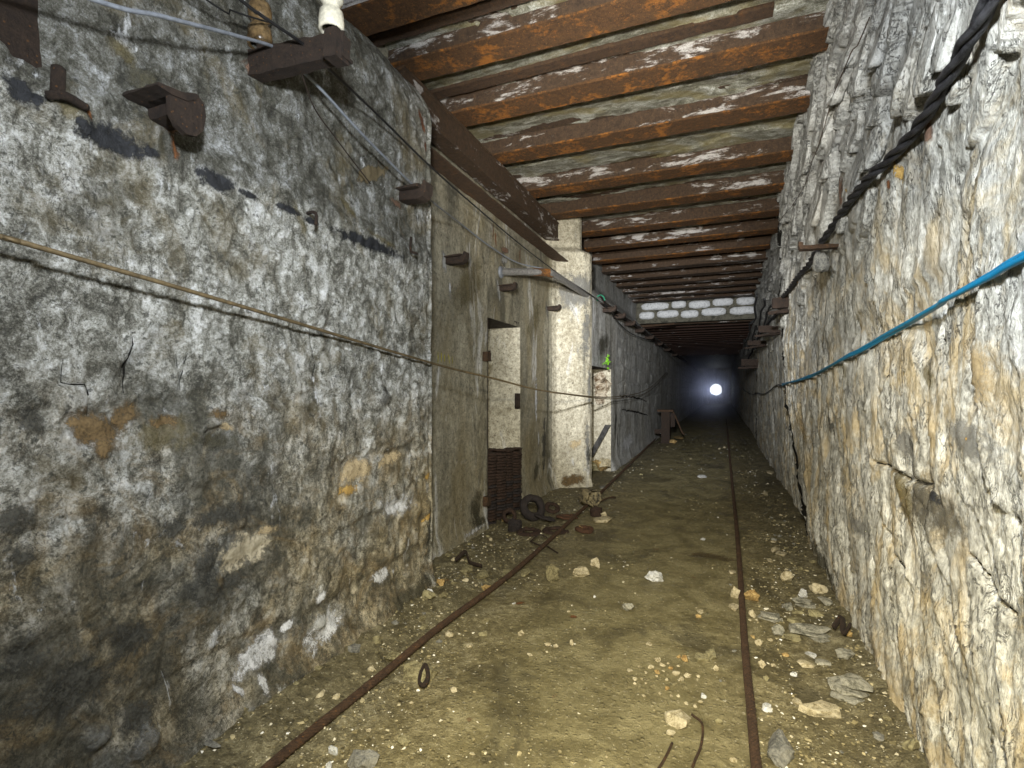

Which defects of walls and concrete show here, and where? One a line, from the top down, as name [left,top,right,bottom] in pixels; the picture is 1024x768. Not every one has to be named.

crack [60,360,89,415]
crack [119,338,134,393]
crack [777,215,808,536]
crack [877,462,935,485]